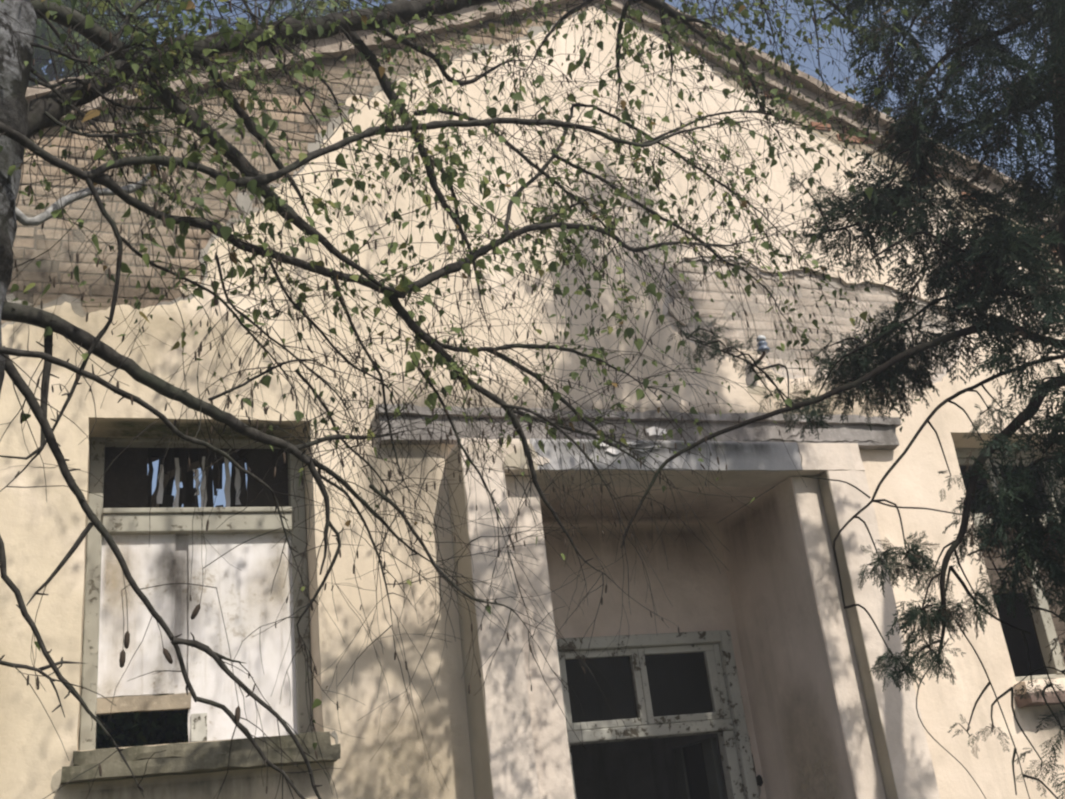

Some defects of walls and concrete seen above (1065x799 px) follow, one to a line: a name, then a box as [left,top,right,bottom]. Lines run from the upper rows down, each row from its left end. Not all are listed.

peeling [4,0,596,317]
peeling [662,256,962,391]
leakage [166,552,186,626]